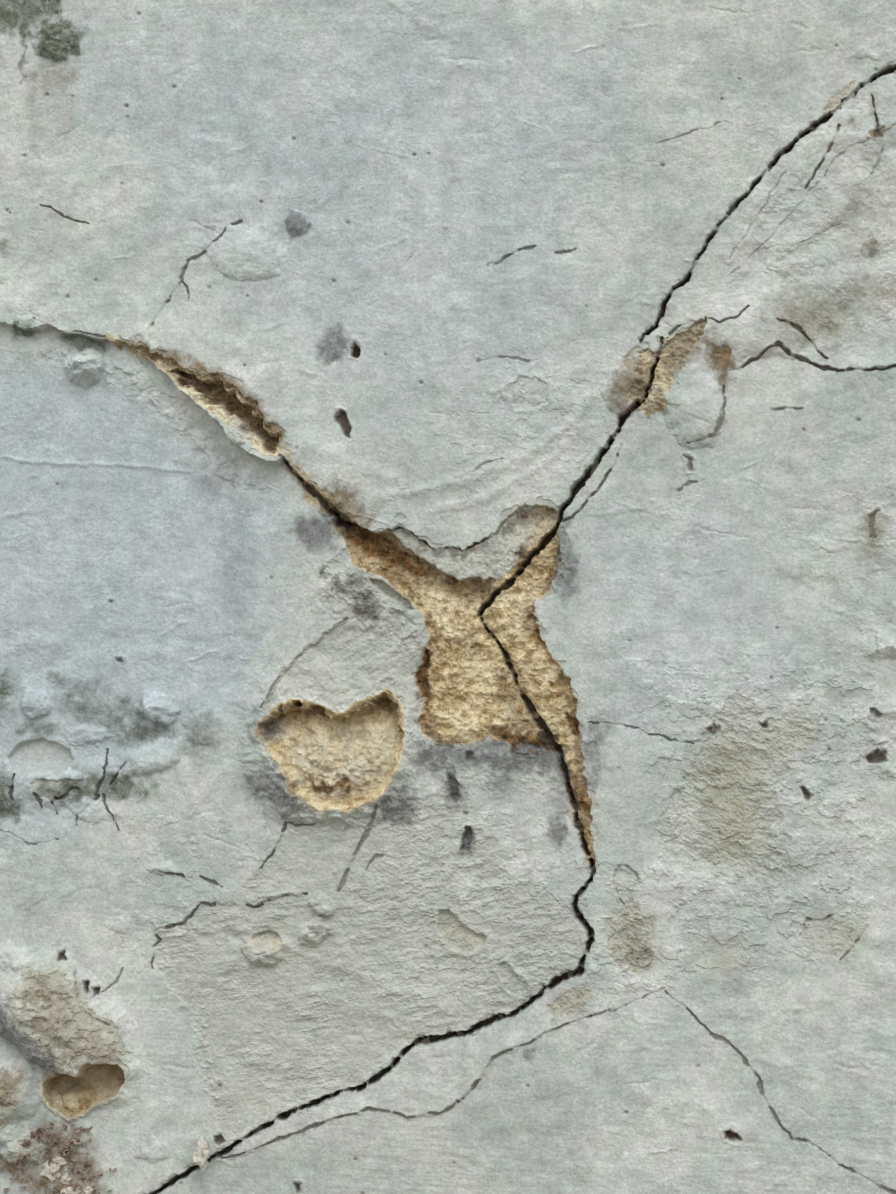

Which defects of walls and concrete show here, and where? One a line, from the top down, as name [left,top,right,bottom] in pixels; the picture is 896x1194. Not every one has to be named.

water stain [0,0,79,83]
crack [39,204,90,225]
crack [32,219,244,364]
spalling [130,335,293,461]
spalling [624,312,713,421]
crack [207,61,896,1194]
crack [0,748,128,847]
peeling [149,497,661,1147]
crack [72,821,327,1028]
spalling [31,1053,130,1122]
crack [140,1163,202,1194]